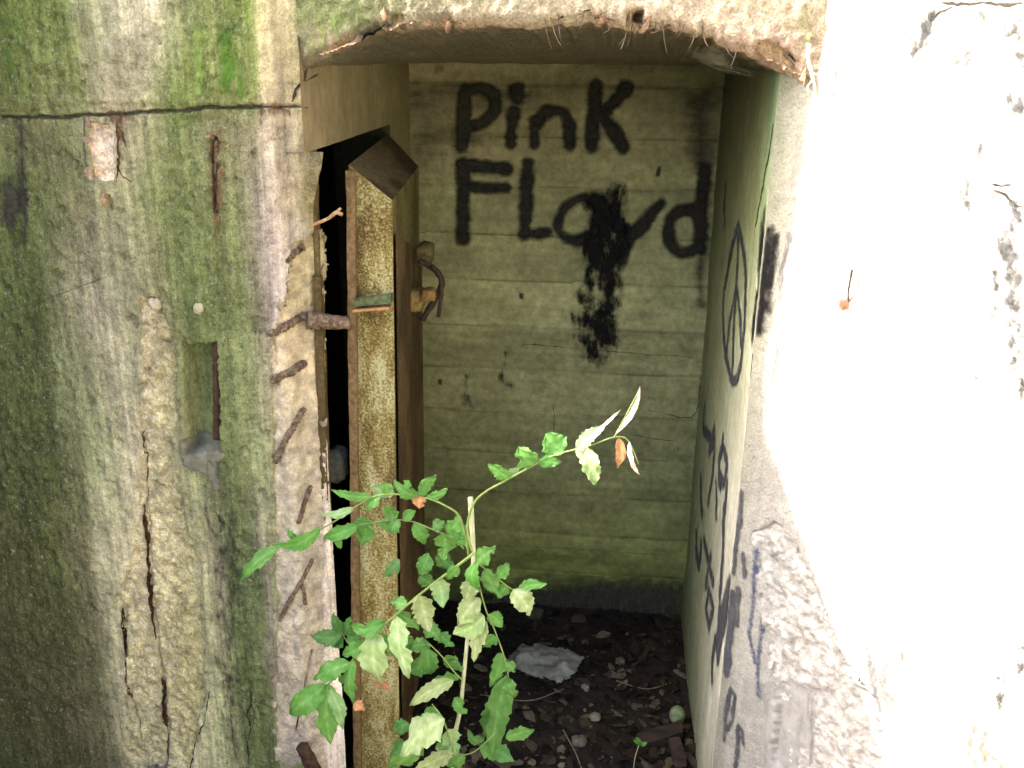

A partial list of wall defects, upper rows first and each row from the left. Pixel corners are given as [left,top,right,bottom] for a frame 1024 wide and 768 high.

spalling [82,115,119,208]
crack [2,68,318,194]
crack [121,430,210,768]